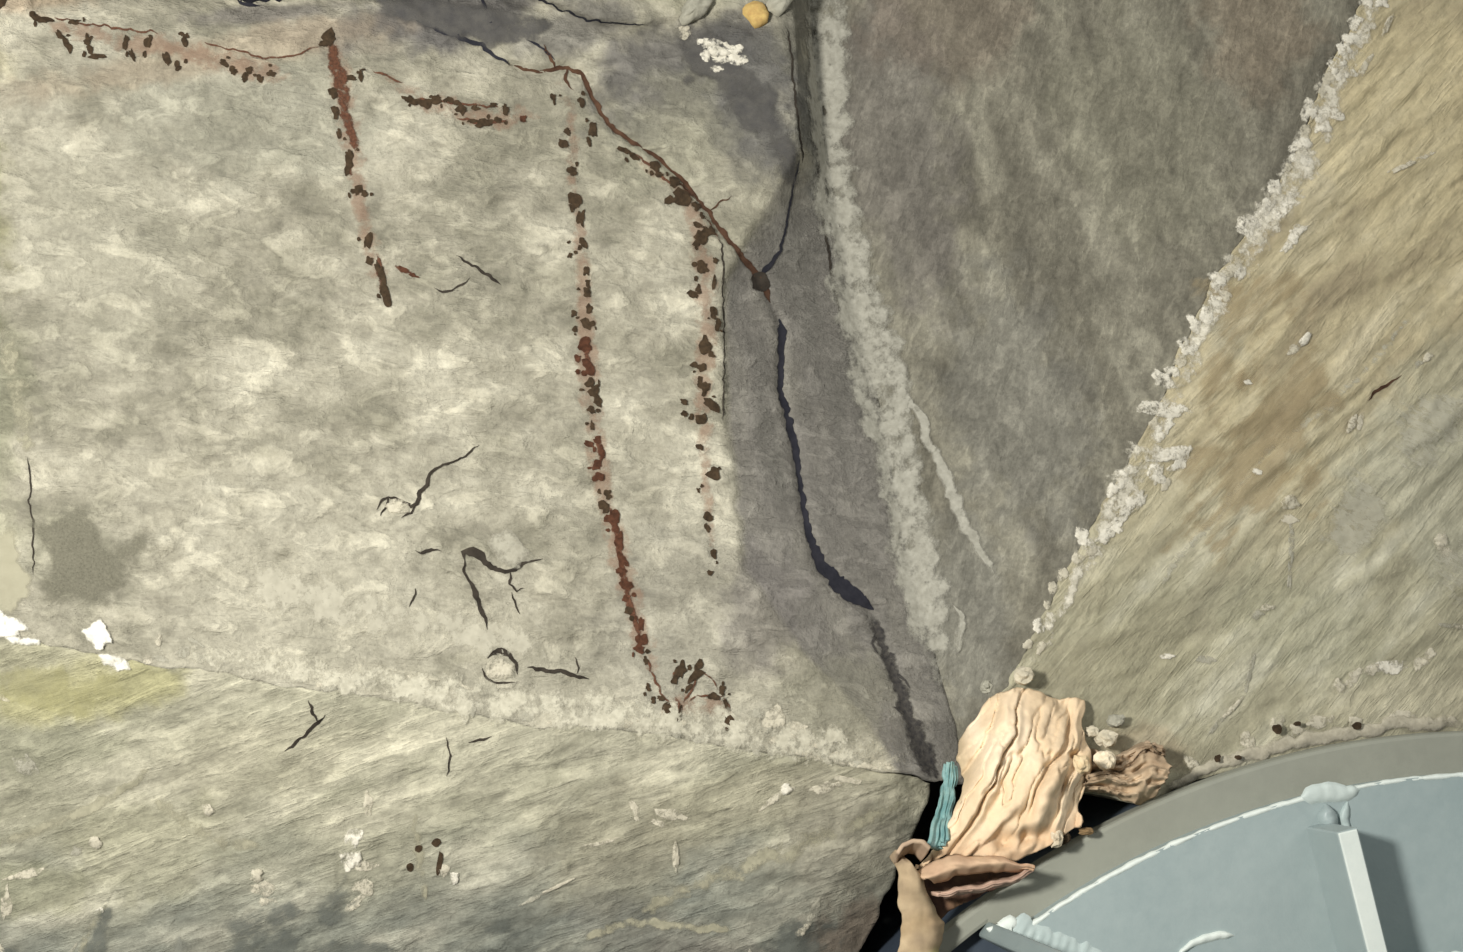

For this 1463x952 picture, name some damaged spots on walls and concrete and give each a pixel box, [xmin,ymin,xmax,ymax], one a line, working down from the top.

crack [237,0,281,8]
rust [29,11,526,198]
rust [357,232,419,307]
rust [550,91,734,731]
crack [415,0,938,778]
crack [377,446,478,518]
crack [285,701,325,751]